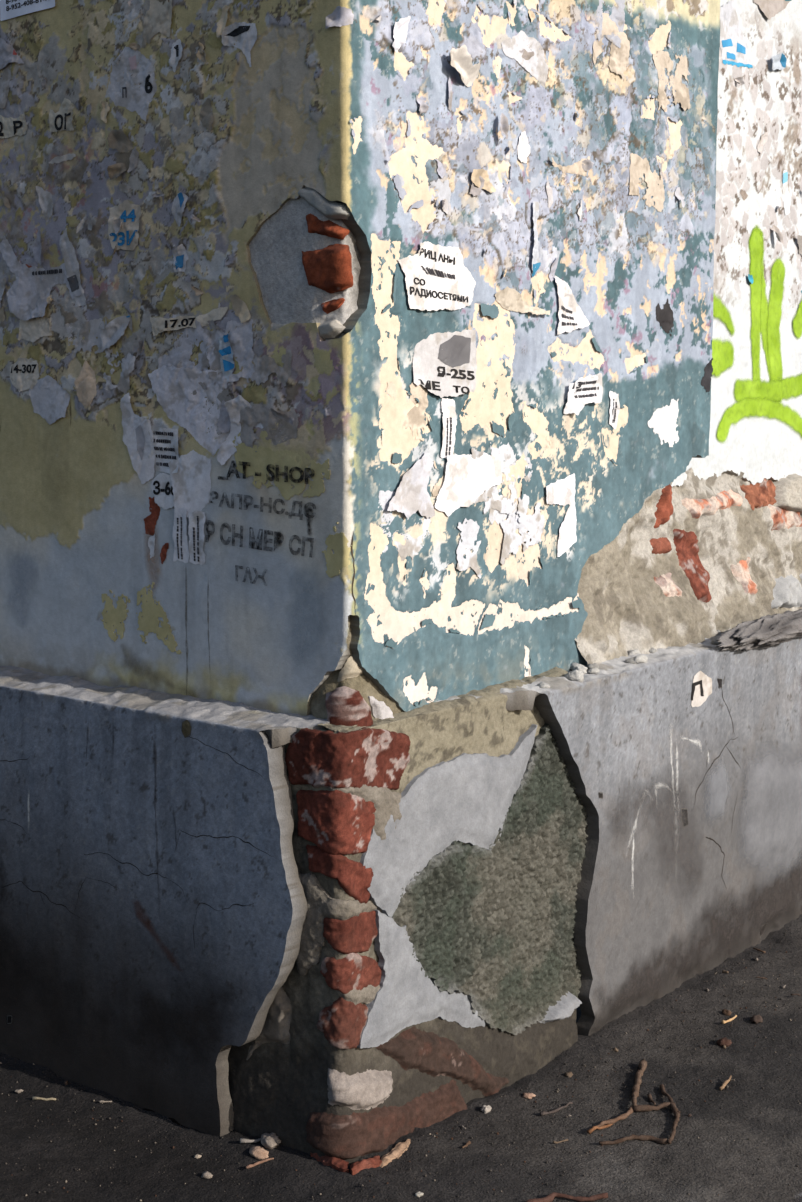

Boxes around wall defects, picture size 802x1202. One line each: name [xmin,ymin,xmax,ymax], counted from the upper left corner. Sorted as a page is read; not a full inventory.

peeling [471,0,571,104]
peeling [648,20,671,57]
peeling [388,111,445,233]
peeling [640,95,682,176]
flaking render [249,186,434,465]
peeling [548,330,605,370]
peeling [459,303,553,587]
peeling [601,405,628,466]
flaking render [364,467,802,665]
crack [2,852,254,946]
crack [175,831,270,856]
flaking render [228,616,588,1163]